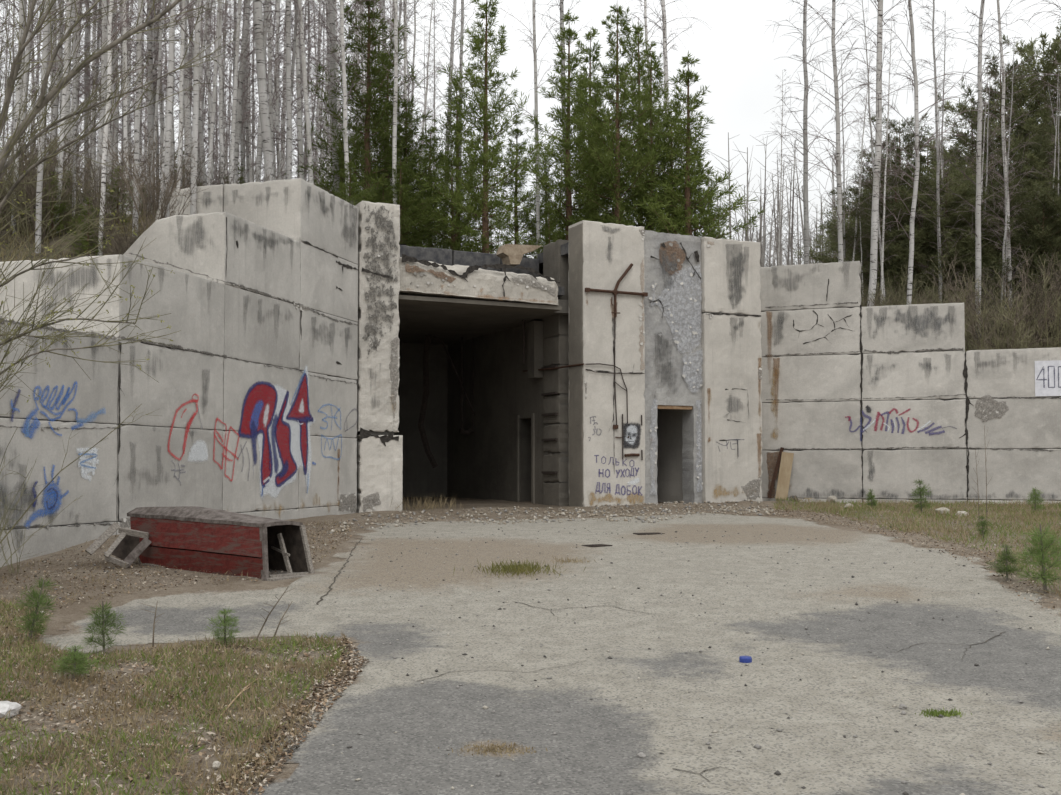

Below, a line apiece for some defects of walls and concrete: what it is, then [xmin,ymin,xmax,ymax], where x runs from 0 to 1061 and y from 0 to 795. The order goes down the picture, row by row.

spalling [362,205,456,418]
corrosion [585,288,648,297]
water stain [729,254,744,306]
peeling [639,240,714,495]
corrosion [759,358,780,411]
crack [793,279,866,497]
spalling [974,395,1021,422]